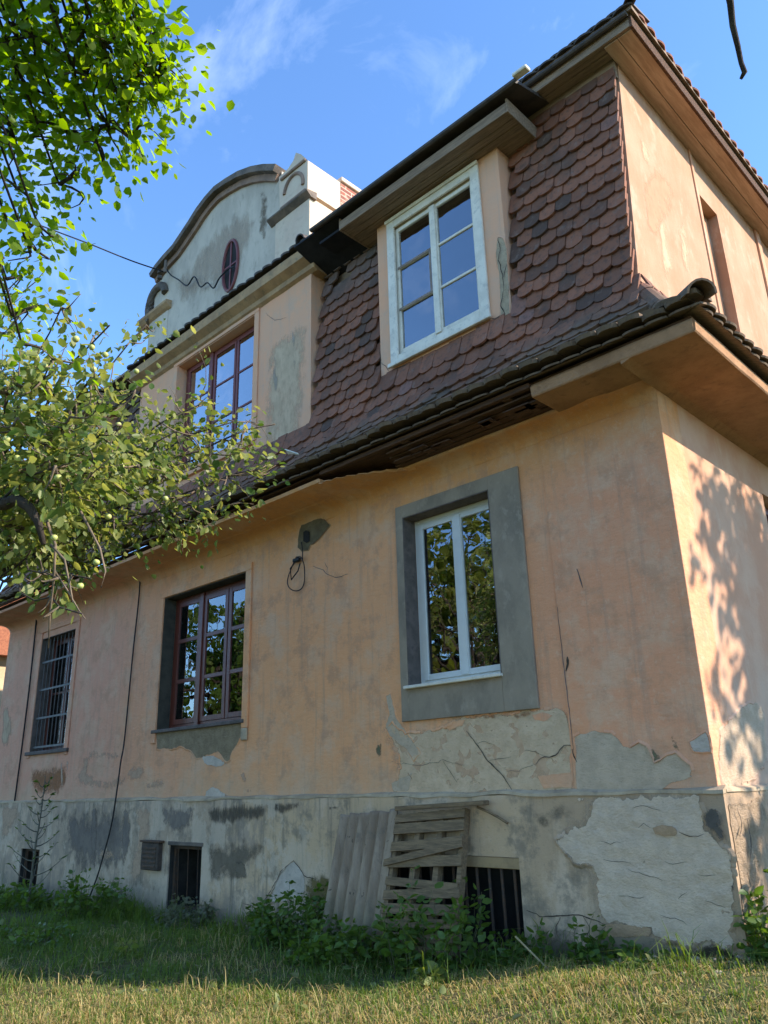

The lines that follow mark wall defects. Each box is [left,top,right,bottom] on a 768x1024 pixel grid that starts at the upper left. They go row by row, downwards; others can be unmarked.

damp [266,330,305,441]
crack [466,607,577,790]
spalling [156,723,241,767]
damp [67,809,130,868]
damp [163,807,192,831]
damp [210,804,297,823]
spalling [376,692,767,953]
damp [704,809,723,839]
damp [210,847,261,878]